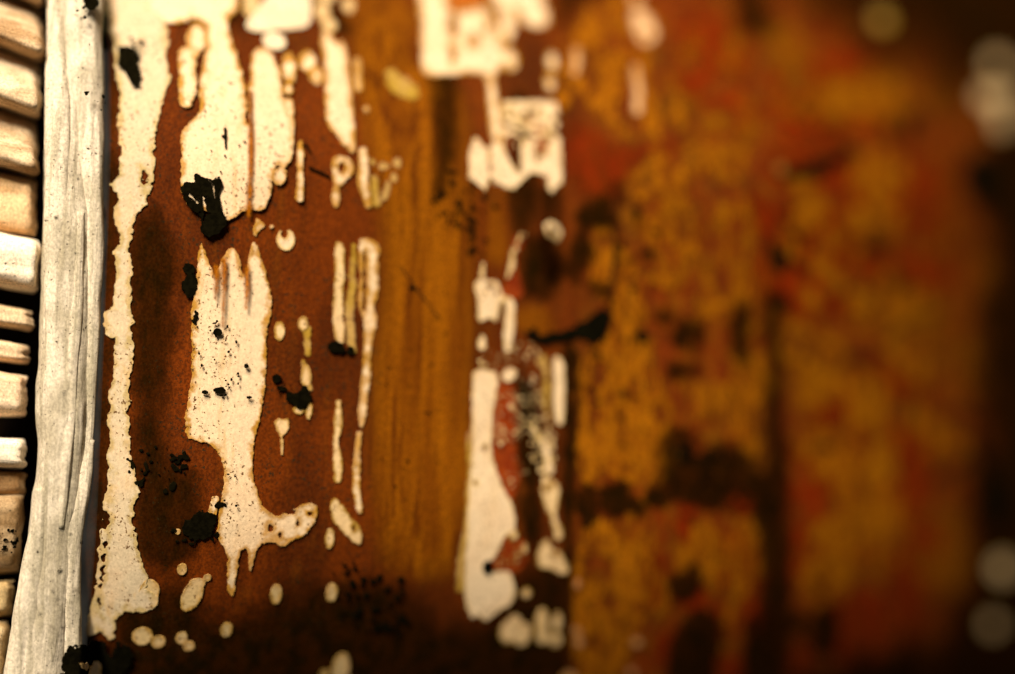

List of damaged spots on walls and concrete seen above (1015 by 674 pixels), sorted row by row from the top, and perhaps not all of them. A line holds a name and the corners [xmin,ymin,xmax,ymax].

rust [447,0,485,10]
peeling [385,68,420,101]
peeling [418,0,563,193]
rust [246,91,254,216]
rust [568,127,641,196]
peeling [544,221,562,242]
rust [213,258,227,326]
peeling [86,0,401,640]
rust [361,28,469,570]
peeling [456,233,584,648]
peeling [132,627,195,651]
peeling [320,653,350,674]